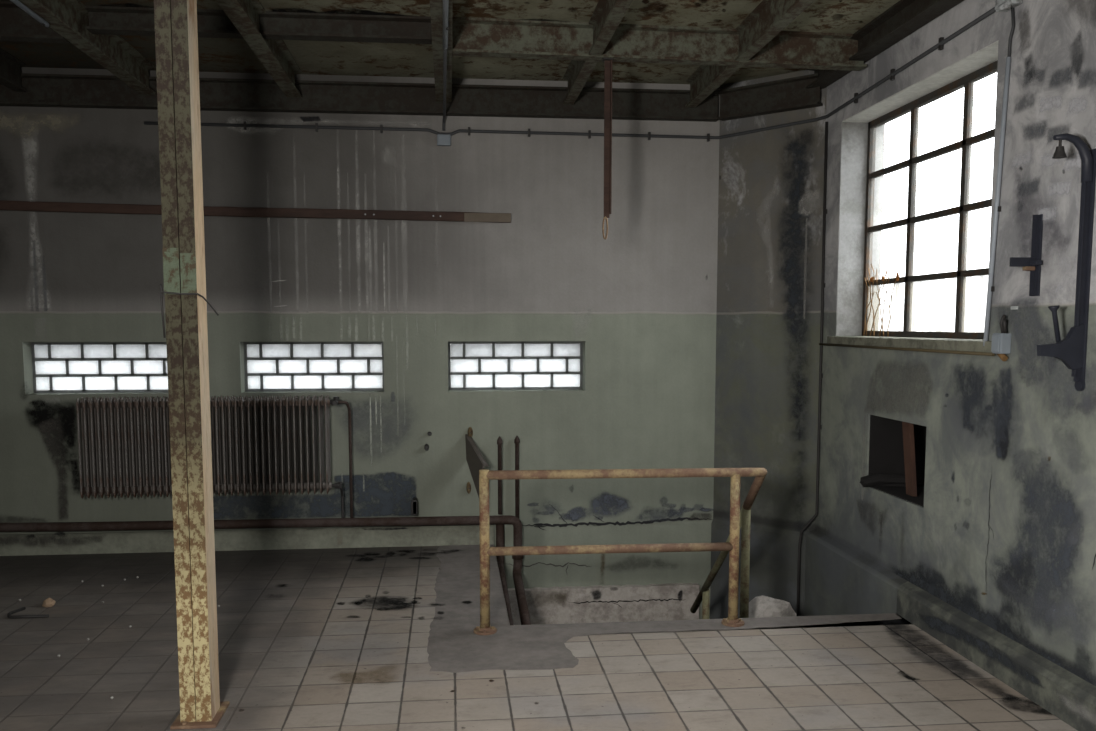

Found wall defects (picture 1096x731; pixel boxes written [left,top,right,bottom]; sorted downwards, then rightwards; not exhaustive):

water stain [766,134,816,455]
water stain [39,419,67,519]
water stain [957,367,1012,459]
water stain [896,471,1093,686]